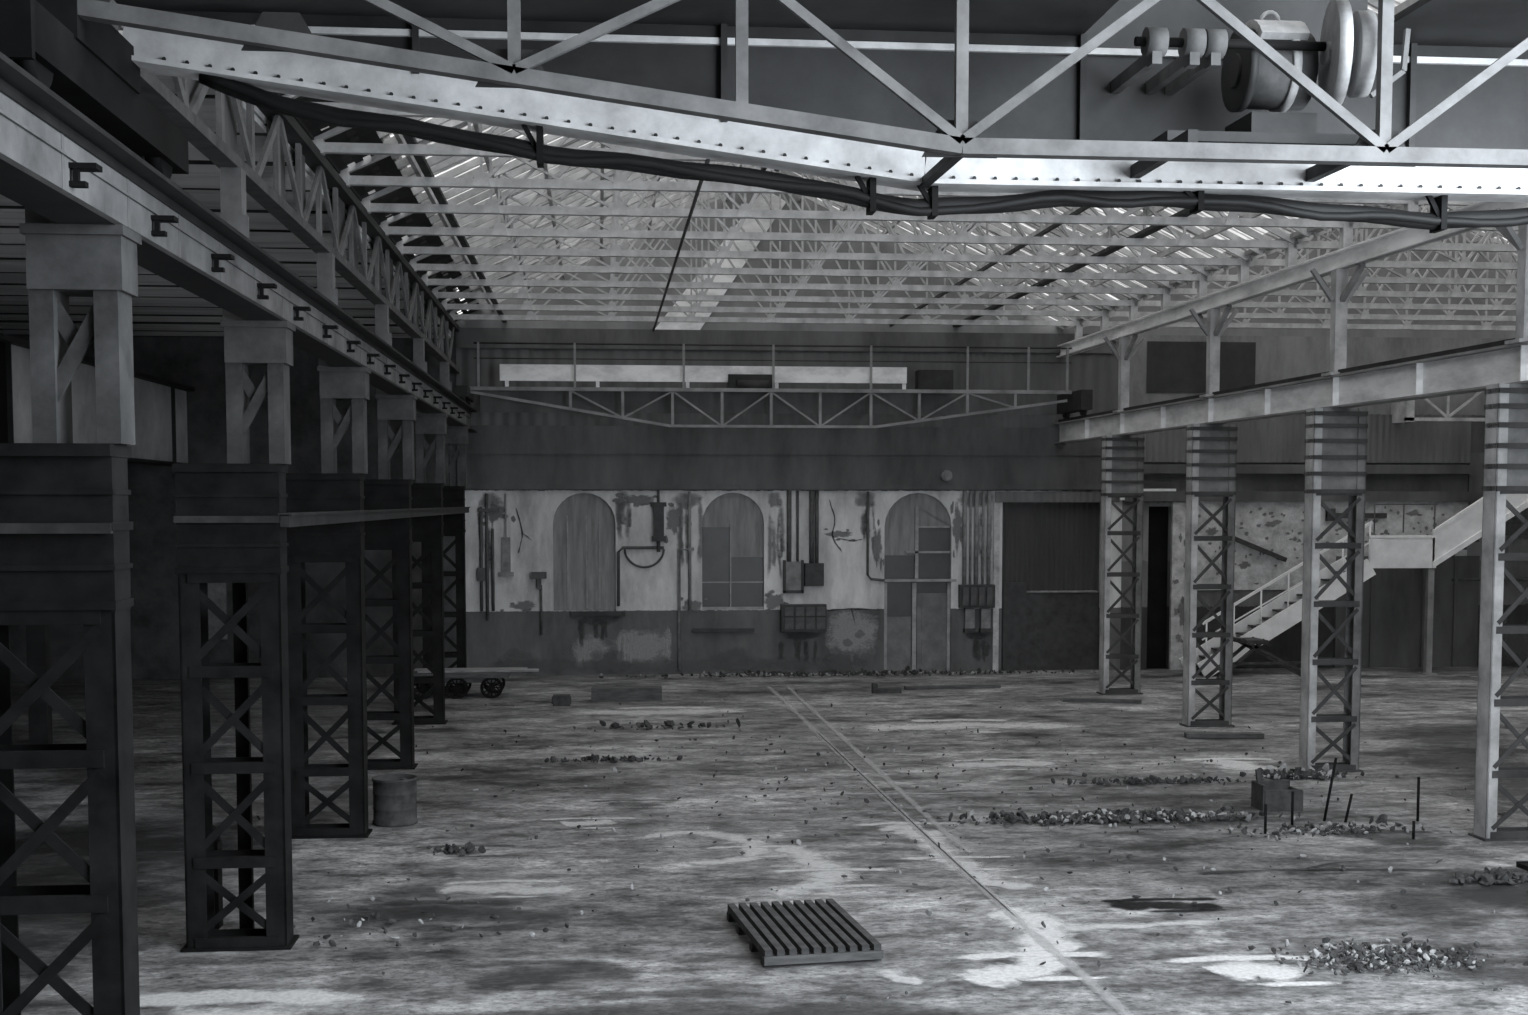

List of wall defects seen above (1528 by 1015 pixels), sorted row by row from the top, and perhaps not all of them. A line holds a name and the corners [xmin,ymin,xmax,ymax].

damp [494,630,861,673]